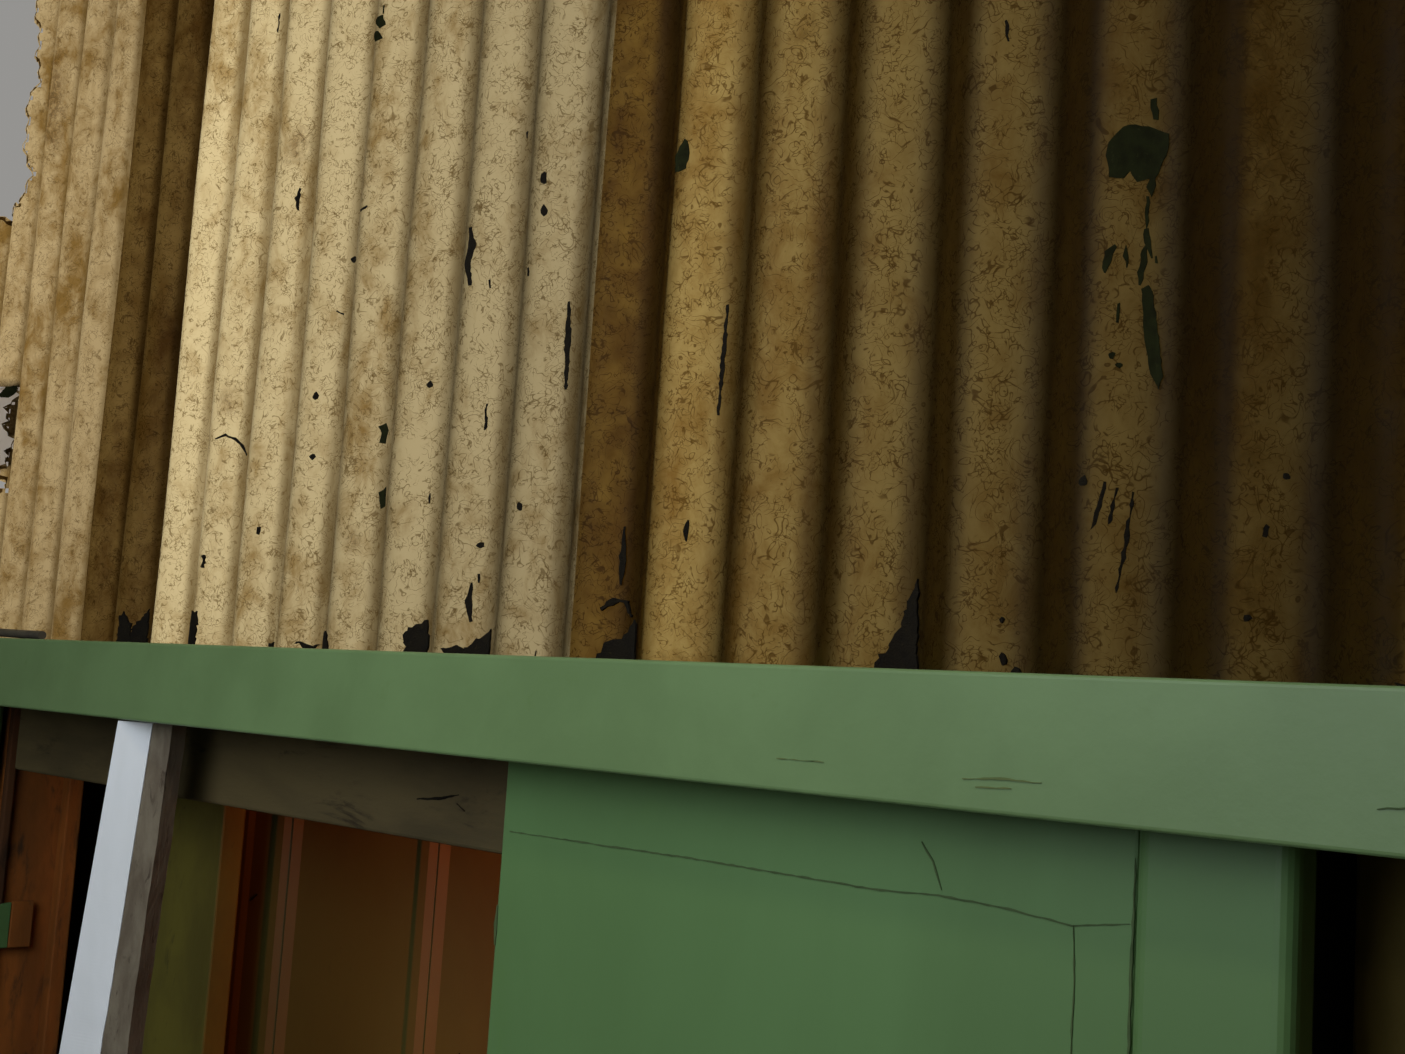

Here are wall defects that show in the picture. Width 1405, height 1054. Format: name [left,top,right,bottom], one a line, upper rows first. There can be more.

peeling [1106,98,1169,228]